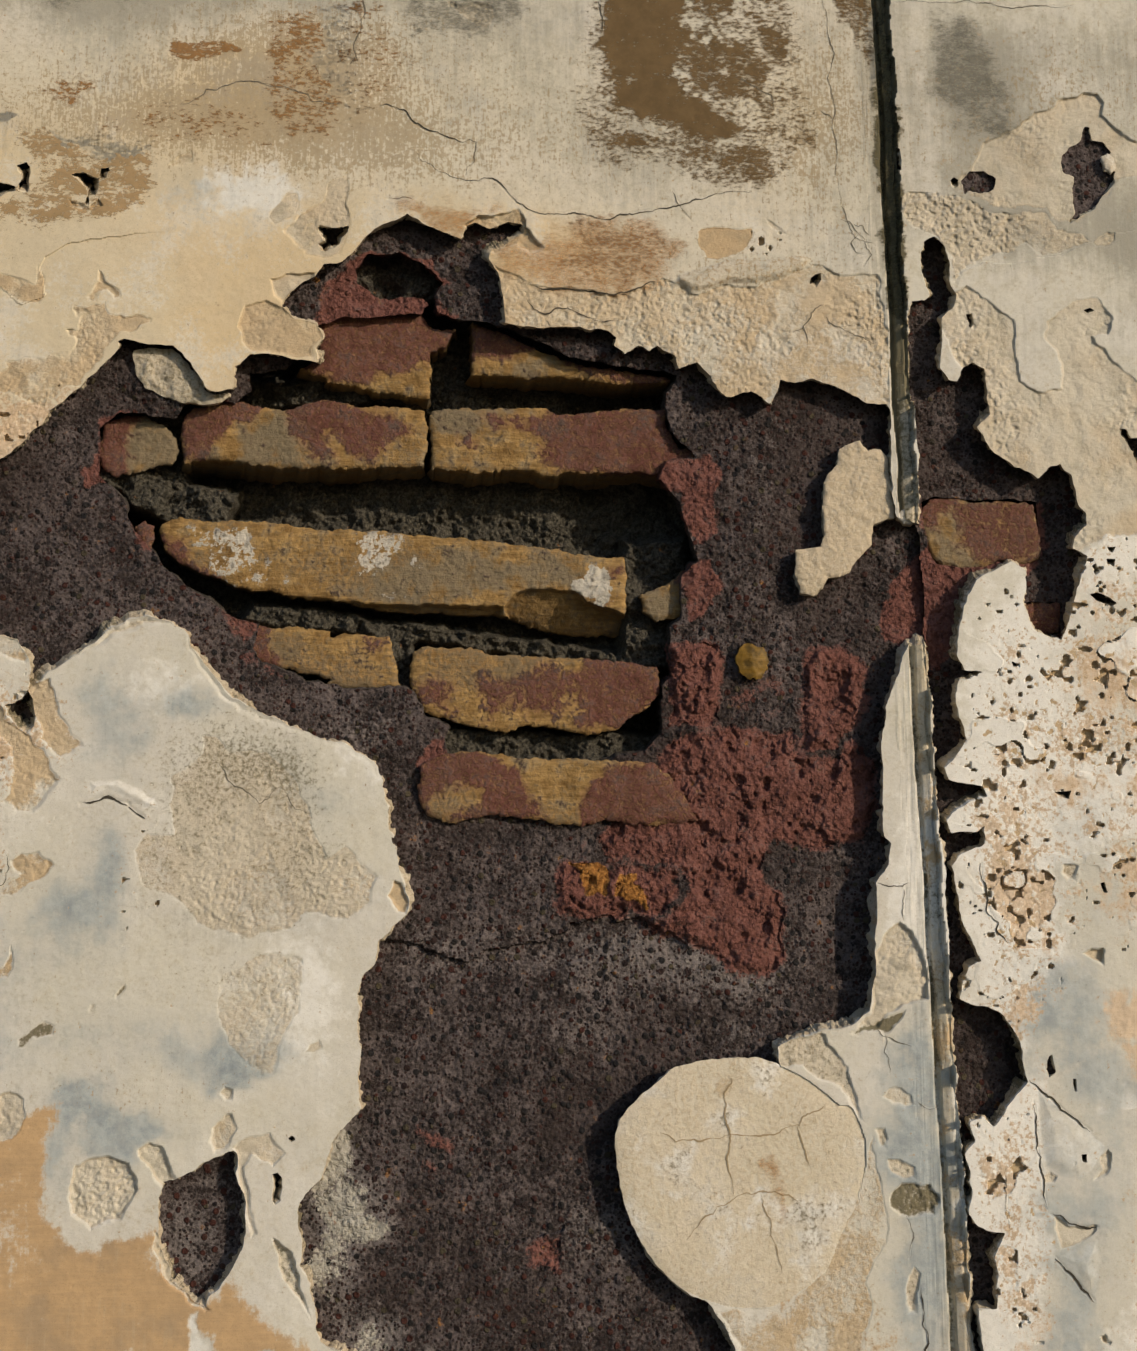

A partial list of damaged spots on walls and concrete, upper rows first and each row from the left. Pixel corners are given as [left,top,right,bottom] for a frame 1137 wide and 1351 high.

flaking render [268,175,352,261]
spalling [901,93,1137,816]
spalling [0,209,930,1351]
flaking render [1083,949,1106,968]
crack [662,1079,823,1270]
flaking render [888,1160,941,1219]
spalling [939,822,1097,1351]
flaking render [1092,1151,1113,1182]